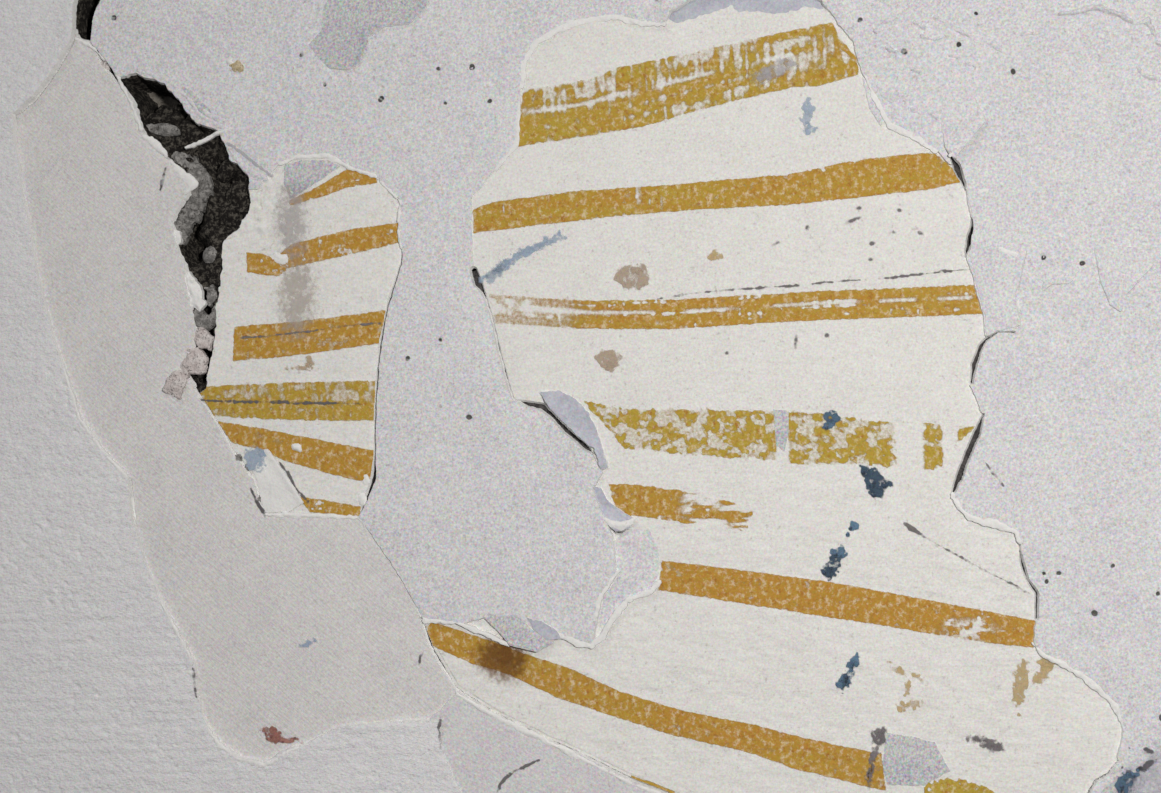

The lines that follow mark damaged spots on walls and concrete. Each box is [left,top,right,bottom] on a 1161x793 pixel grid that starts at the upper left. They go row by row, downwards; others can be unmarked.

flaking render [16,29,458,768]
peeling [422,0,1124,793]